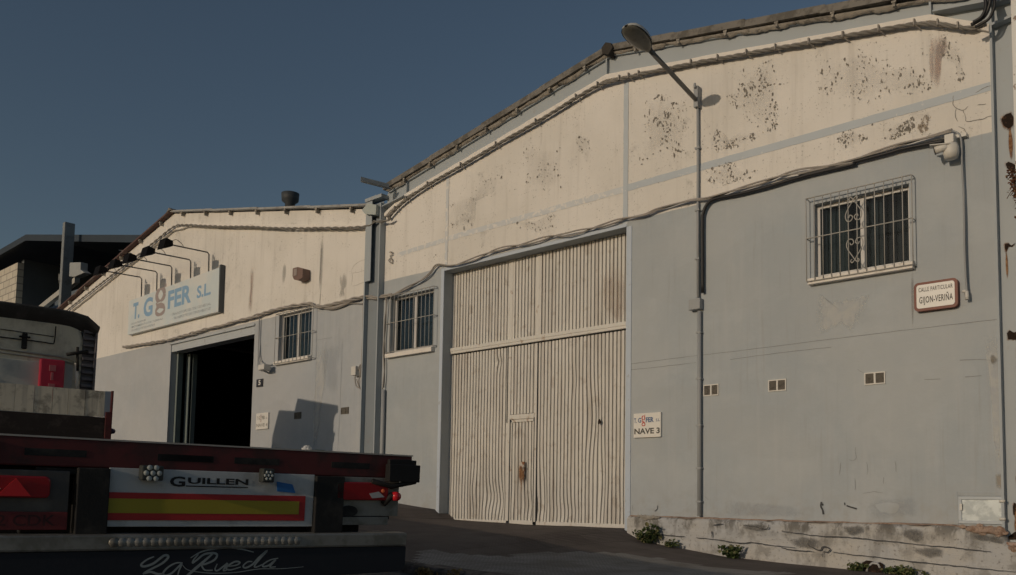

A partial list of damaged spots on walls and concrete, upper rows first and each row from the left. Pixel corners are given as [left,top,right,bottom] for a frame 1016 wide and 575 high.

corrosion [1001,117,1013,157]
spalling [959,523,1016,552]